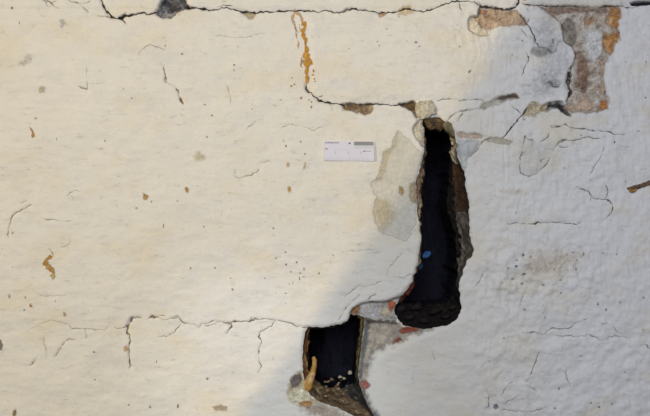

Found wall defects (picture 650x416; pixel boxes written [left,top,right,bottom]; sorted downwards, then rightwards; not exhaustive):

crack [87,0,160,24]
corrosion [291,9,316,84]
crack [185,0,629,102]
spalling [468,8,526,36]
spalling [524,6,621,116]
crack [305,85,410,106]
crack [519,124,625,177]
corrosion [43,255,55,280]
spalling [287,101,512,416]
crack [114,315,164,365]
crack [227,318,306,367]